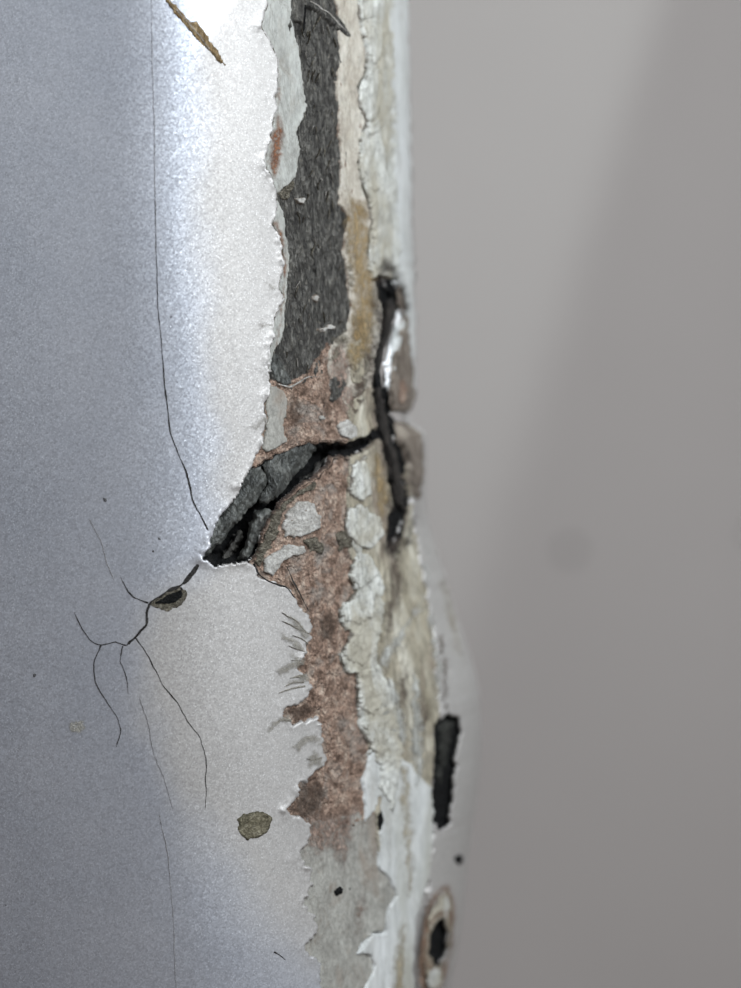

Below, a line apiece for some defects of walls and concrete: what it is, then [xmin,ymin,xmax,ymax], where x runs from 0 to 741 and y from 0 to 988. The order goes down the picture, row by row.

crack [74,3,417,988]
peeling [254,0,460,988]